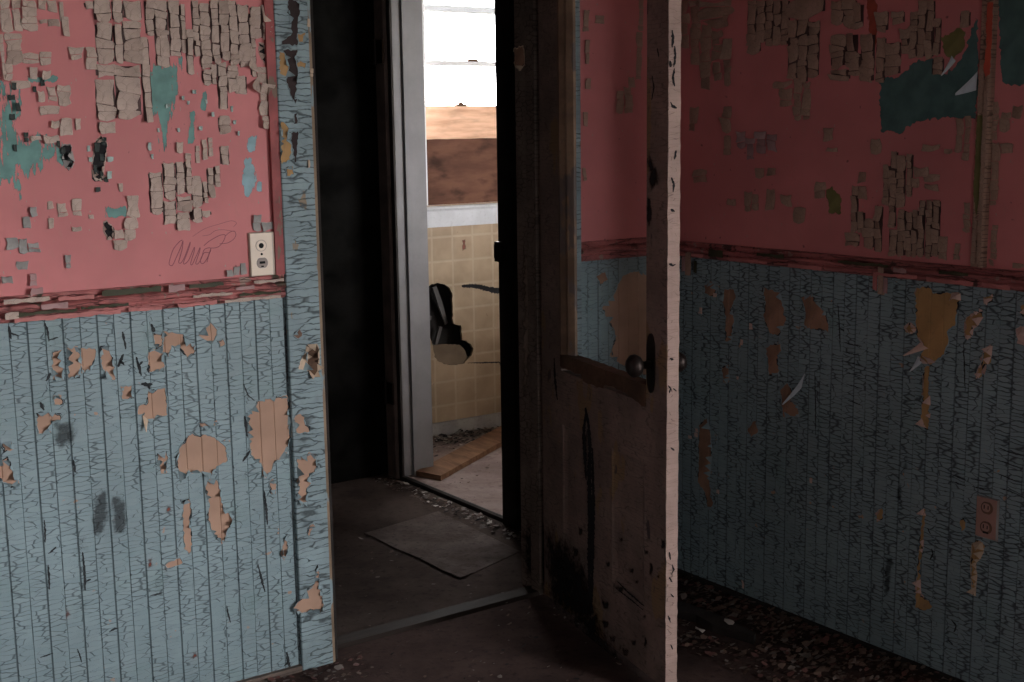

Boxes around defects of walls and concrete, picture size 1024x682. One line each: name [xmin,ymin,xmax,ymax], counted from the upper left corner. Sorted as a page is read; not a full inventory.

peeling [746,0,956,84]
peeling [0,0,313,323]
peeling [838,151,1011,430]
peeling [51,345,169,432]
crack [118,332,153,389]
peeling [157,420,234,544]
crack [243,384,255,461]
crack [261,491,269,525]
peeling [246,395,318,506]
crack [283,314,291,416]
crack [44,520,56,590]
crack [82,552,91,591]